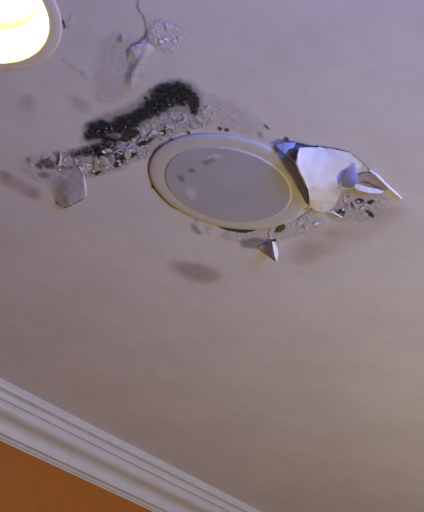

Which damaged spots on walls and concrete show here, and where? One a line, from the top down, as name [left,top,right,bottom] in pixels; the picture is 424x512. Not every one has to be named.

crack [128,2,147,55]
spalling [36,106,224,209]
damp [70,82,200,168]
peeling [224,142,402,262]